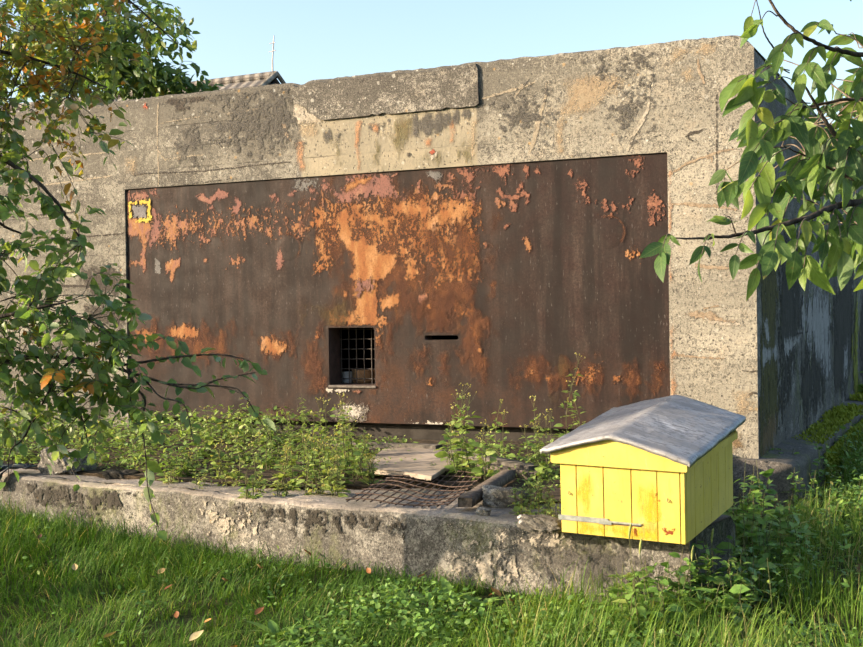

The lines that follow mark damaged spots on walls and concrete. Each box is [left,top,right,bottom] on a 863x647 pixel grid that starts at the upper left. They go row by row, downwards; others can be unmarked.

damp [168,87,310,176]
spalling [293,104,322,124]
corrosion [131,179,489,391]
corrosion [516,330,675,395]
damp [759,258,863,457]
damp [234,503,418,543]